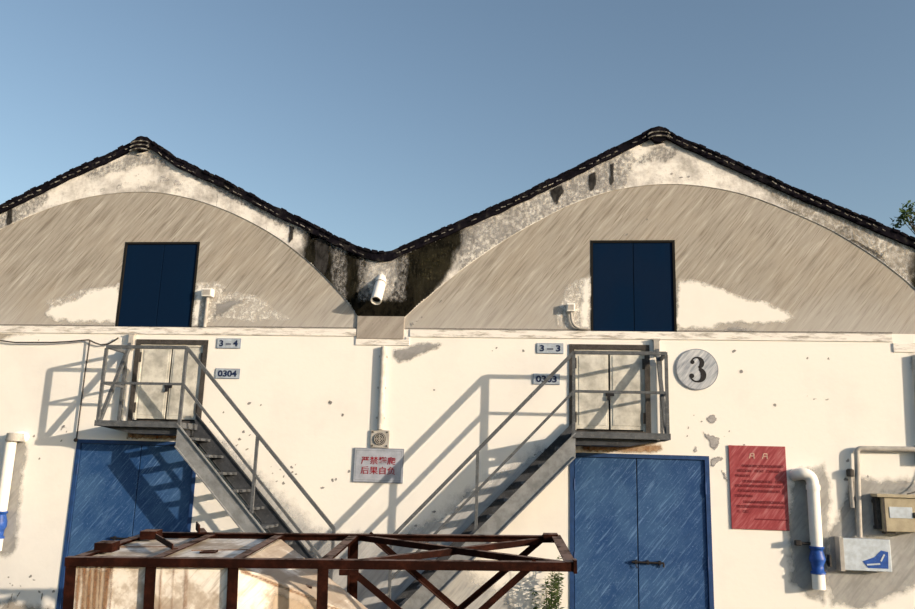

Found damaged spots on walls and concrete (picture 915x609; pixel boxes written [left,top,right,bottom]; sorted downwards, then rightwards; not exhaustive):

damp [191,145,676,317]
peeling [46,283,120,324]
peeling [193,283,289,326]
peeling [556,278,591,328]
peeling [676,280,790,331]
damp [394,343,440,362]